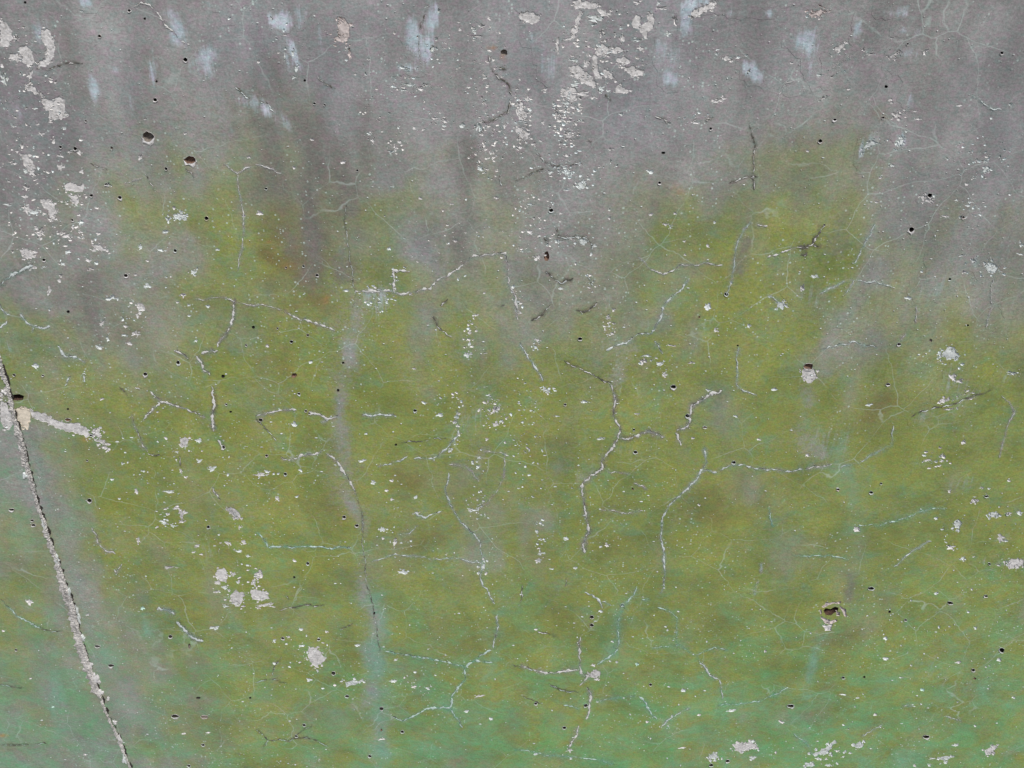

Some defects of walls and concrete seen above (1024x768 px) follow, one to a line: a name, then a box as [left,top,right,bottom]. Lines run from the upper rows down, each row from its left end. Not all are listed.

peeling [0,17,111,295]
peeling [0,392,148,505]
leakage [0,0,433,768]
crack [120,297,333,466]
peeling [192,507,275,610]
leakage [436,108,494,299]
crack [344,204,597,381]
peeling [343,0,727,313]
crack [256,348,871,760]
leakage [571,263,672,406]
crack [606,224,767,354]
leakage [374,307,1024,768]